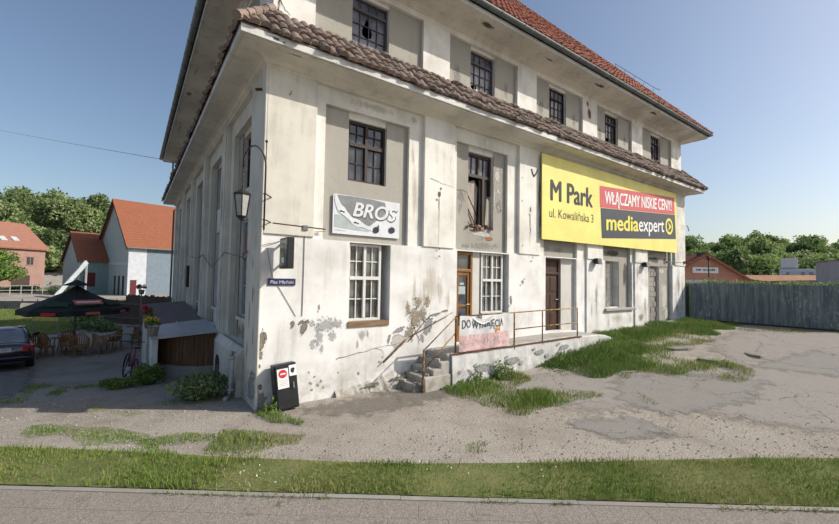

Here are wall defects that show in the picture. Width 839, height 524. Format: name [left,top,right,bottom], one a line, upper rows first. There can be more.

peeling [290,305,342,352]
crack [336,313,436,360]
peeling [387,326,409,350]
spalling [420,310,448,342]
spalling [247,330,267,410]